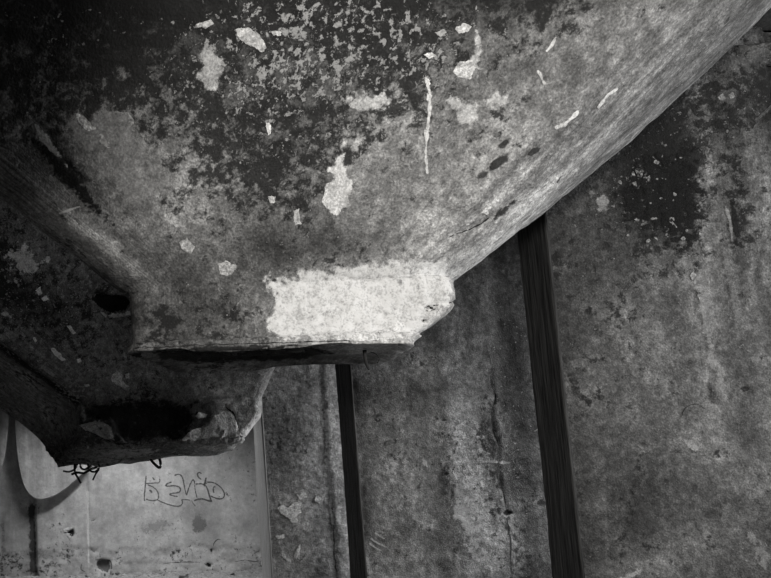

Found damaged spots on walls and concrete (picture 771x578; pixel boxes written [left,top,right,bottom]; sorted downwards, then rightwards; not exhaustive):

peeling [197,48,224,91]
peeling [236,27,266,52]
peeling [435,23,482,79]
crack [752,105,771,129]
spalling [322,140,353,215]
damp [589,142,710,257]
damp [719,184,744,325]
spalling [91,294,131,318]
flaking render [263,260,453,370]
damp [689,267,727,405]
flaking render [182,403,243,441]
crack [490,368,513,578]